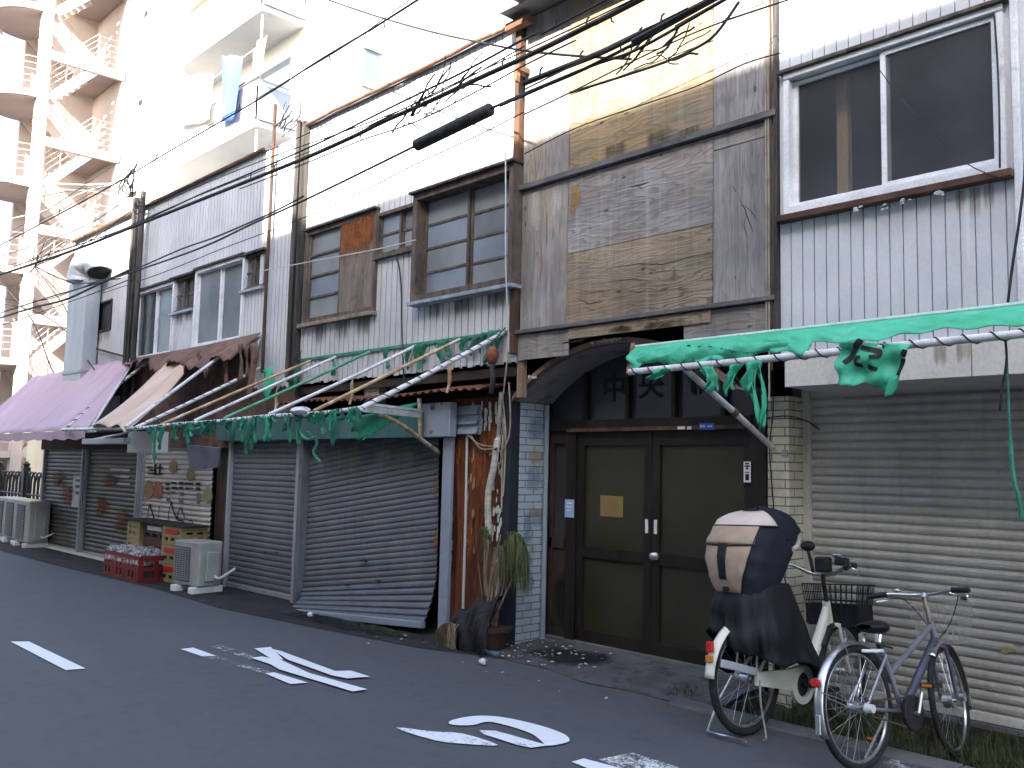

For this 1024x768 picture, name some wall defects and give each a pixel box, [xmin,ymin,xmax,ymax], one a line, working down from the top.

crack [732,186,757,235]
rust [456,408,497,505]
rust [458,518,472,564]